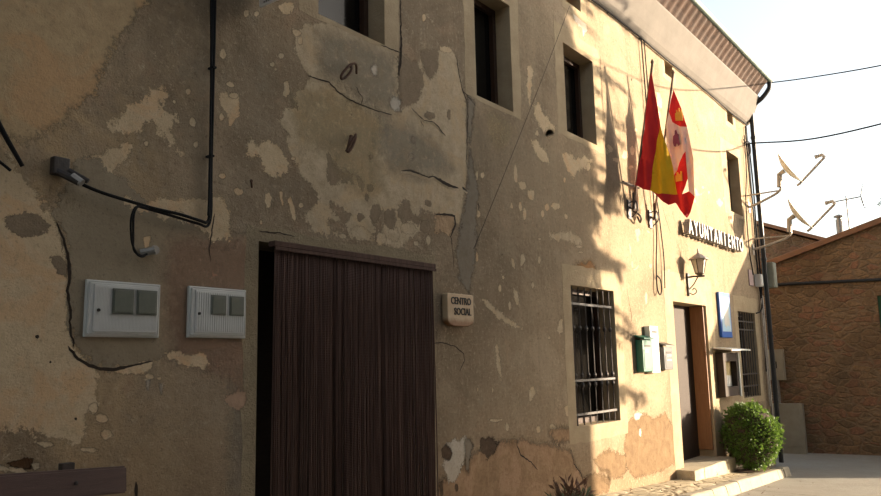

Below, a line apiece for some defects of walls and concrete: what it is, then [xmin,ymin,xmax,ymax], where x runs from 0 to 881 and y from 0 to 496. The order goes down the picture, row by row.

peeling [246,21,485,249]
crack [309,58,479,211]
peeling [0,0,150,453]
peeling [123,193,233,245]
crack [436,213,456,266]
peeling [114,361,162,380]
peeling [164,350,210,370]
flaking render [0,457,40,473]
flaking render [438,405,675,496]